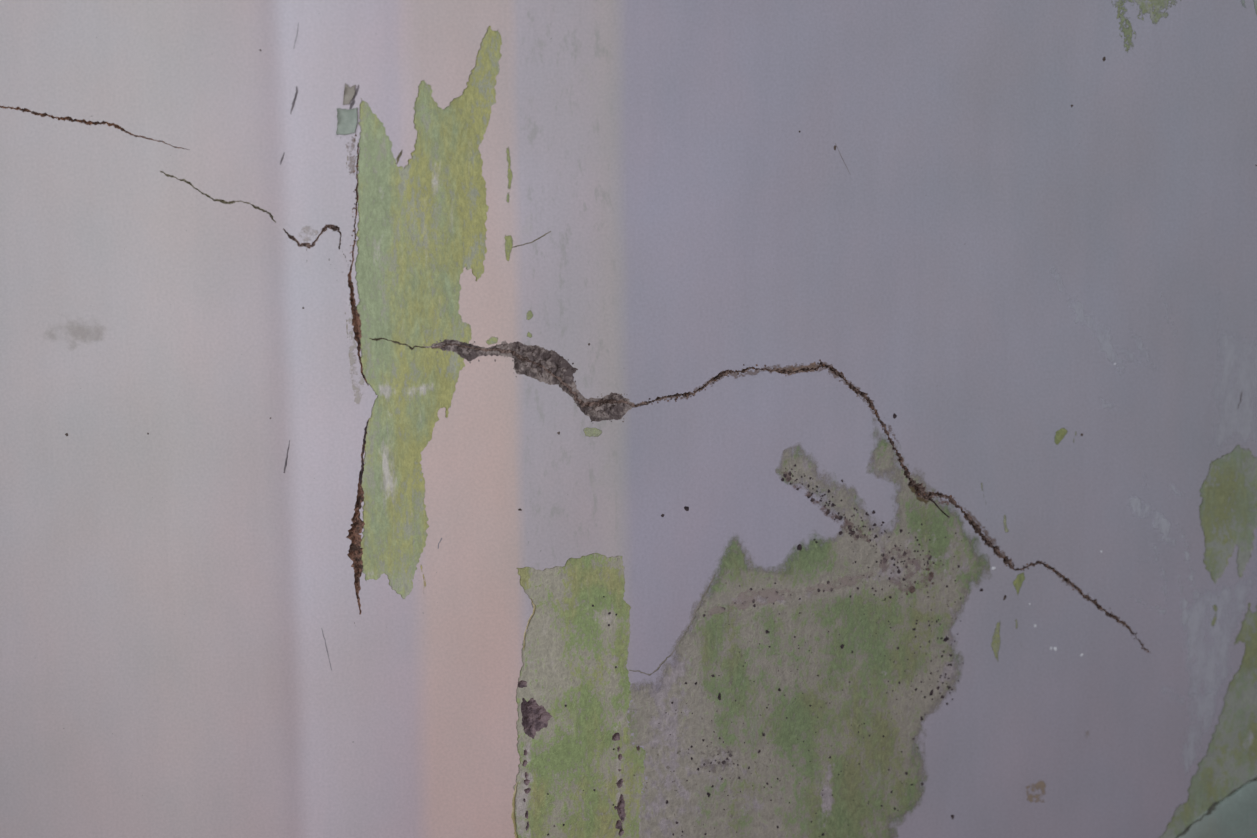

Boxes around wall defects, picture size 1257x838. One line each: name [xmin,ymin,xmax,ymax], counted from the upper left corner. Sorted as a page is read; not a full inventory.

peeling [1115,0,1181,51]
peeling [336,26,502,599]
peeling [505,235,513,261]
crack [0,106,1151,653]
peeling [1199,444,1257,584]
peeling [511,439,990,838]
peeling [1159,603,1257,838]